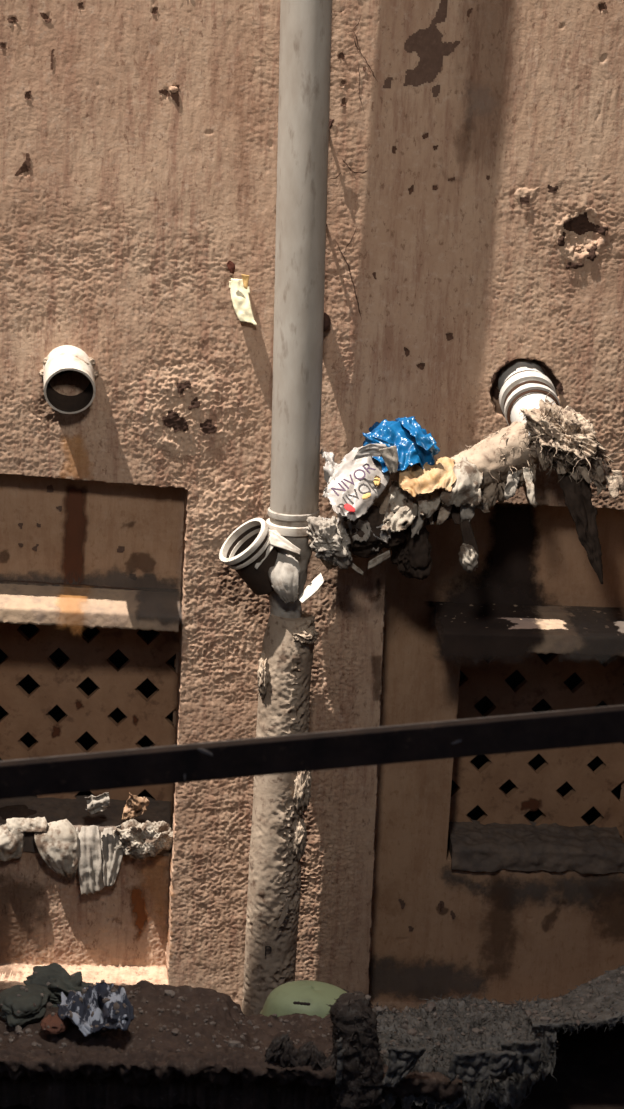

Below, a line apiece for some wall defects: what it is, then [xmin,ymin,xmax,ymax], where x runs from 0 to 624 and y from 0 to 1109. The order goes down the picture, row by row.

spalling [555,207,608,269]
corrosion [62,485,87,588]
damp [428,503,624,665]
damp [368,870,624,999]